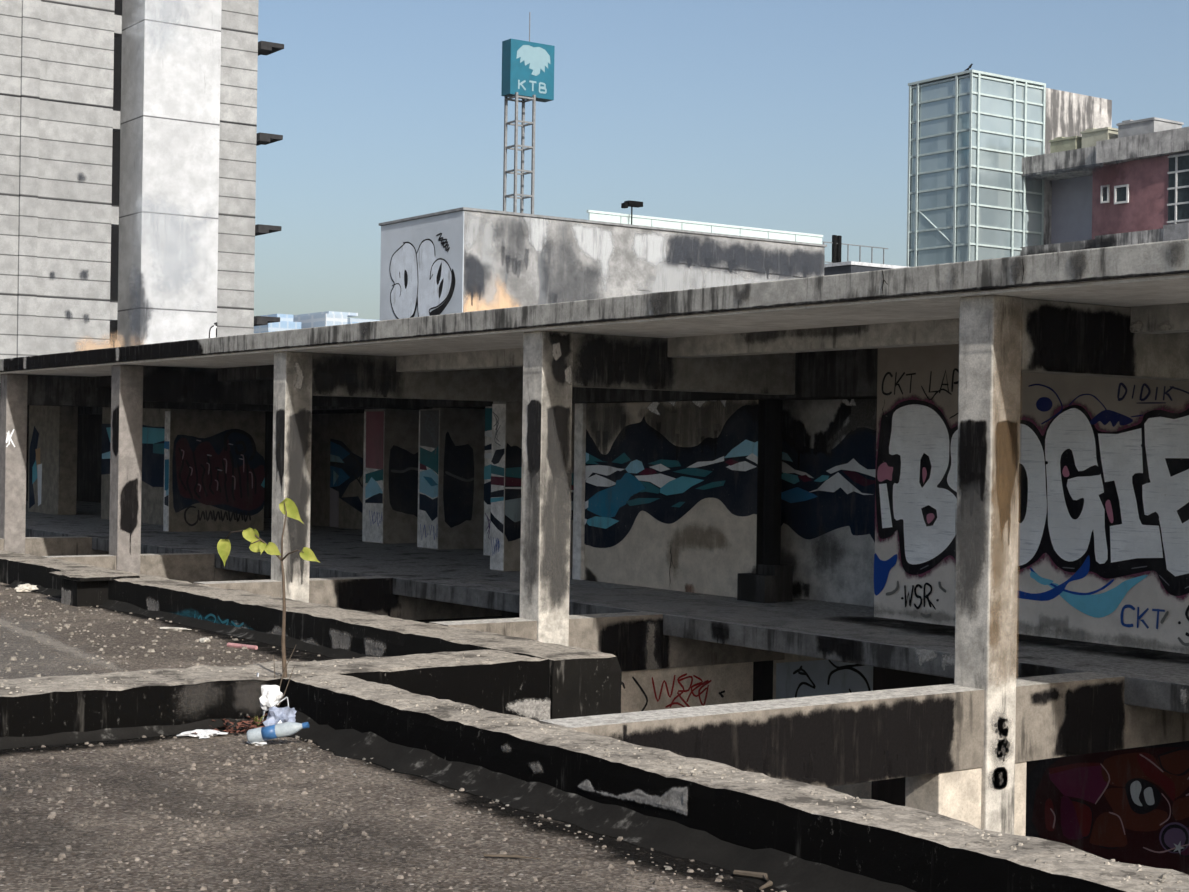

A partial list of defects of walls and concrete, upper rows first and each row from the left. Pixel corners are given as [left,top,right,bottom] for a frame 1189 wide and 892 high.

water stain [464,217,497,305]
water stain [0,234,1189,448]
water stain [586,403,627,456]
water stain [782,399,877,470]
water stain [465,455,955,671]
water stain [1017,634,1189,664]
spalling [578,780,688,815]